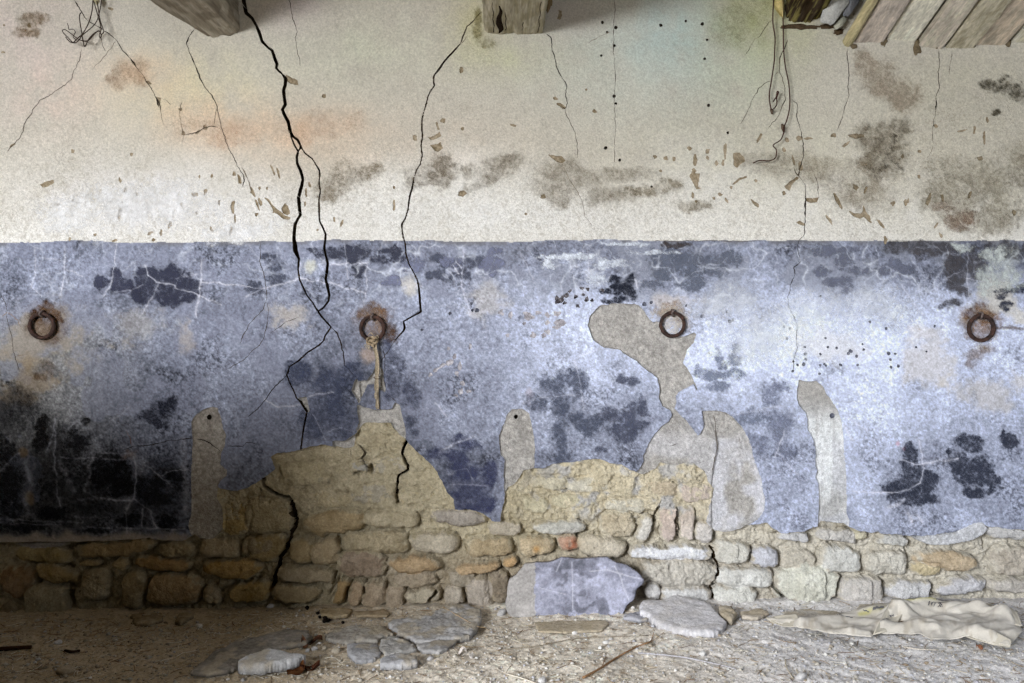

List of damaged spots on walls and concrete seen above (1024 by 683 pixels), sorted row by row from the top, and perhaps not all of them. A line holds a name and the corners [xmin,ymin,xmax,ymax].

crack [7,0,251,190]
crack [227,0,357,450]
crack [381,13,480,401]
water stain [94,263,203,309]
corrosion [357,303,397,342]
corrosion [656,301,687,334]
corrosion [961,303,1020,365]
water stain [526,368,650,464]
crack [396,440,409,503]
flaking render [0,287,1024,613]
water stain [880,441,939,506]
water stain [946,433,1004,499]